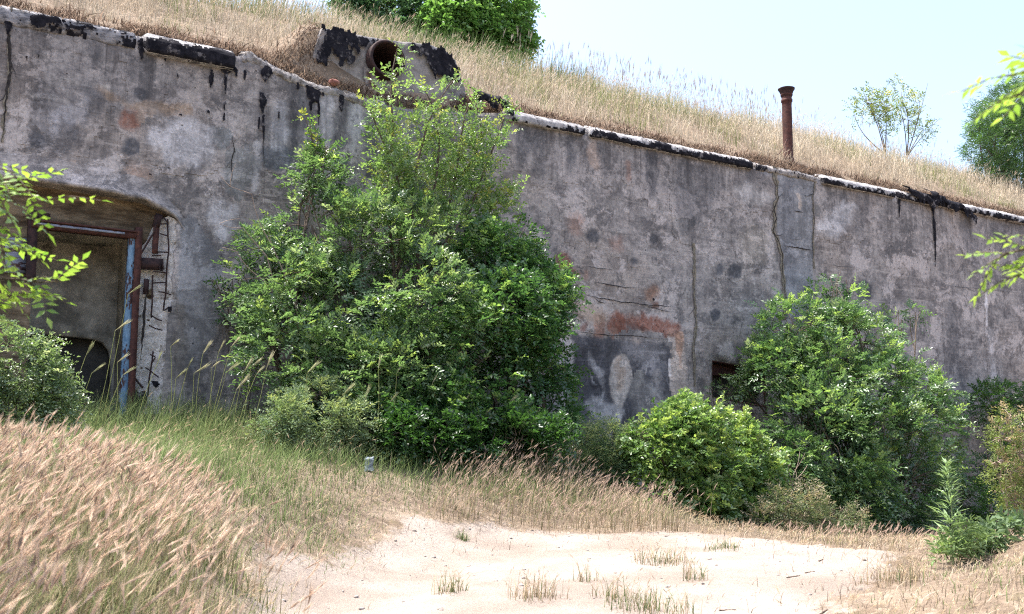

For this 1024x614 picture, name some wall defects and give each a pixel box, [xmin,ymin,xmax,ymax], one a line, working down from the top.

crack [0,6,16,142]
water stain [4,14,395,250]
water stain [568,329,619,424]
rust [552,245,688,355]
crack [570,243,698,386]
crack [771,166,864,320]